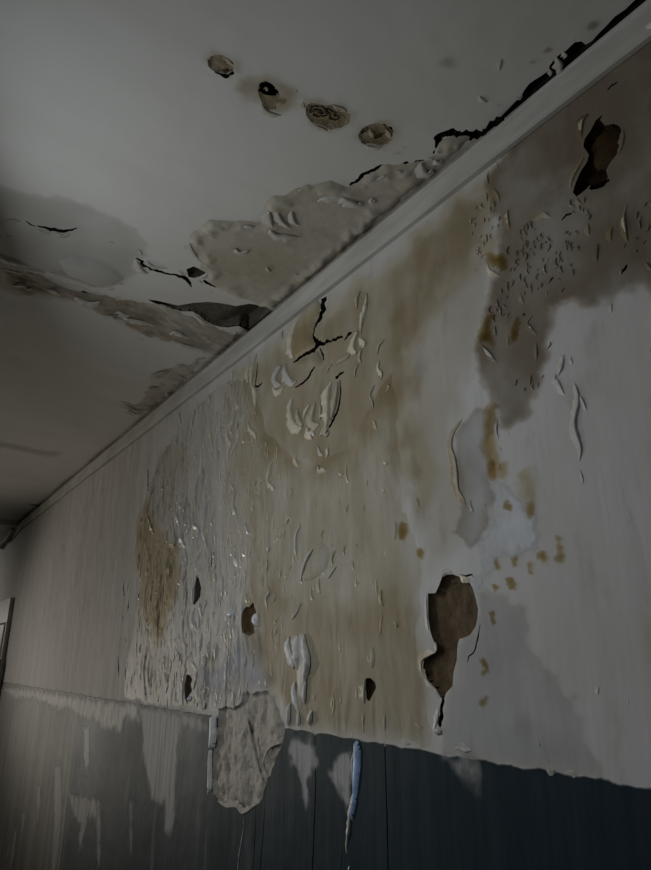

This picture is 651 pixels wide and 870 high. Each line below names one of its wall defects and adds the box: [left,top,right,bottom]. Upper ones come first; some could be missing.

hole [203,55,234,79]
hole [258,81,286,118]
hole [302,102,350,132]
spalling [358,123,394,151]
spalling [469,114,625,362]
peeling [5,271,272,416]
crack [293,297,352,428]
peeling [124,291,480,849]
efflorescence [476,482,536,587]